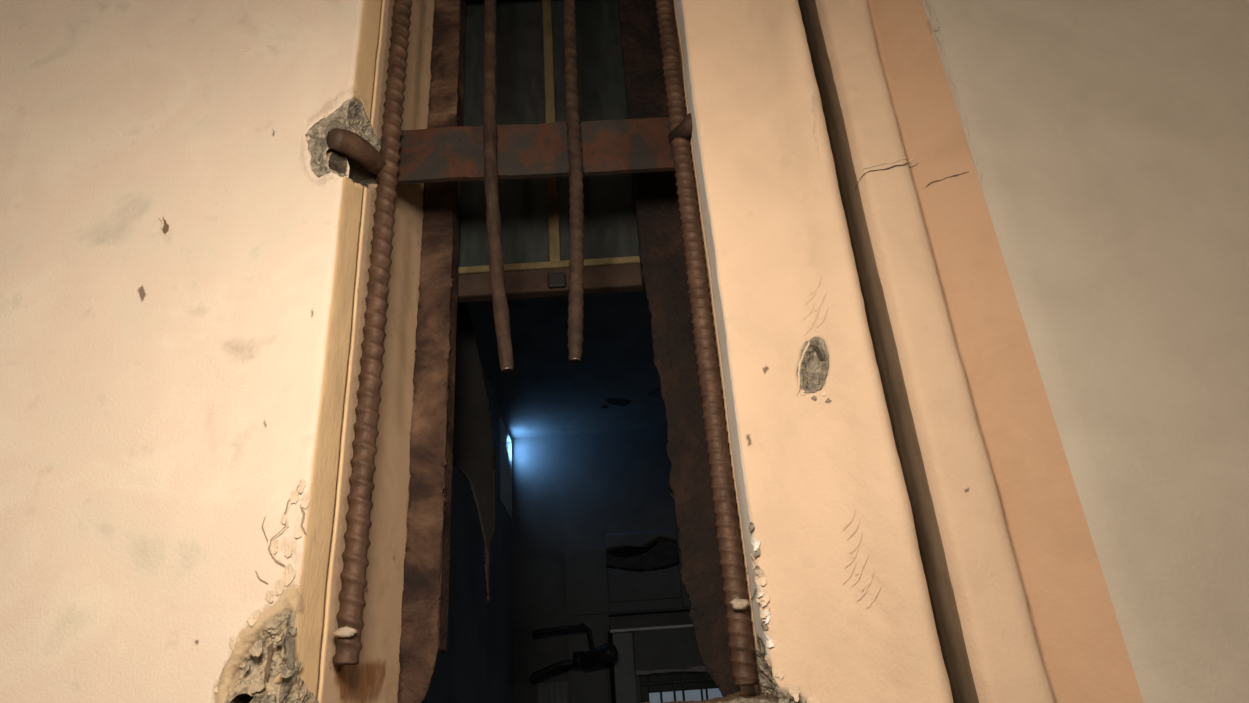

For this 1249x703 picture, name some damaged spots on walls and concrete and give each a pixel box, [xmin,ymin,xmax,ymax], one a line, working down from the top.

flaking render [305,98,381,188]
crack [855,157,967,189]
flaking render [796,336,831,403]
flaking render [213,477,319,703]
flaking render [716,522,820,703]